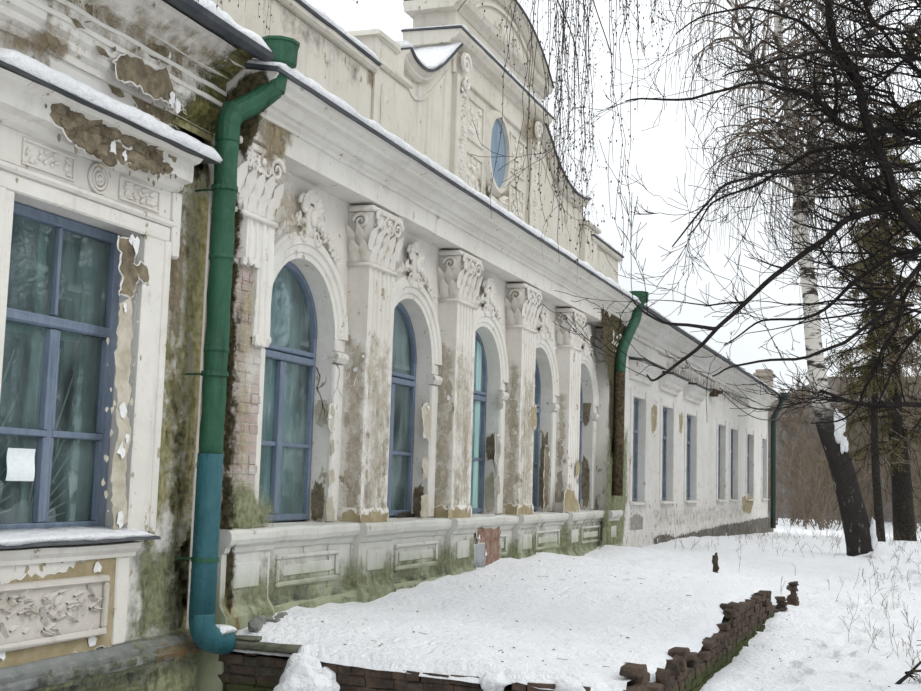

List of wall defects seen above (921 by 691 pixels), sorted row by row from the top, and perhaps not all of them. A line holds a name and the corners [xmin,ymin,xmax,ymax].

water stain [0,26,70,58]
flaking render [95,41,187,129]
flaking render [44,103,178,190]
water stain [171,113,215,146]
water stain [260,119,291,165]
flaking render [101,233,150,530]
water stain [156,163,210,635]
flaking render [310,378,474,523]
flaking render [485,380,591,517]
flaking render [473,526,503,568]
flaking render [0,557,120,668]